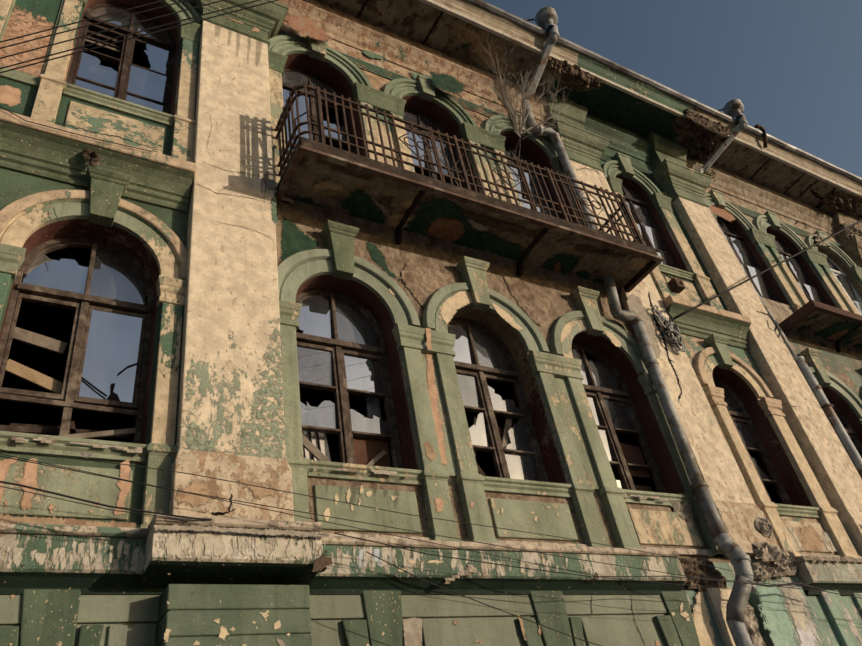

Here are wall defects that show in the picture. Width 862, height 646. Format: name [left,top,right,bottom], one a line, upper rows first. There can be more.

peeling [0,9,52,76]
flaking render [0,85,21,107]
crack [198,116,267,202]
spalling [673,108,731,162]
peeling [290,179,525,261]
peeling [541,253,604,284]
peeling [175,313,293,459]
peeling [0,442,142,528]
peeling [172,478,225,509]
peeling [744,517,817,646]
peeling [214,618,236,646]
peeling [252,610,290,646]